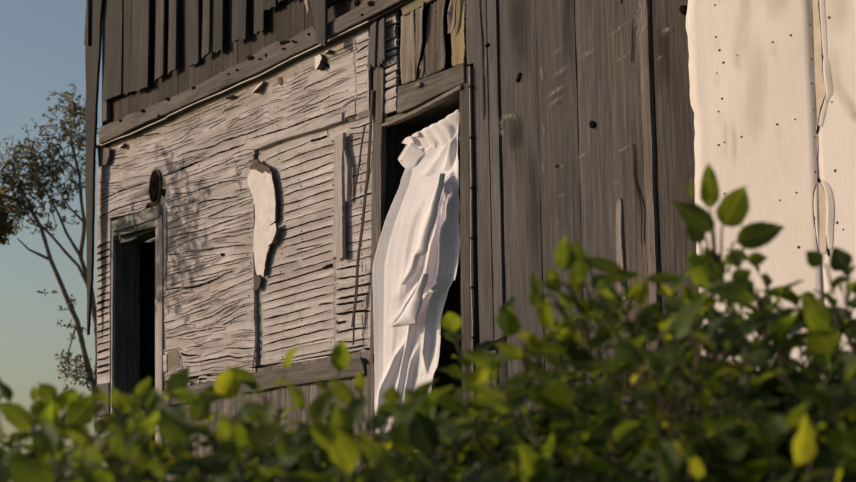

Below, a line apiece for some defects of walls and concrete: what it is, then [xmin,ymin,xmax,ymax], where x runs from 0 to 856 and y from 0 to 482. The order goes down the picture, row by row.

crack [810,0,821,292]
spalling [249,159,272,174]
peeling [266,223,279,246]